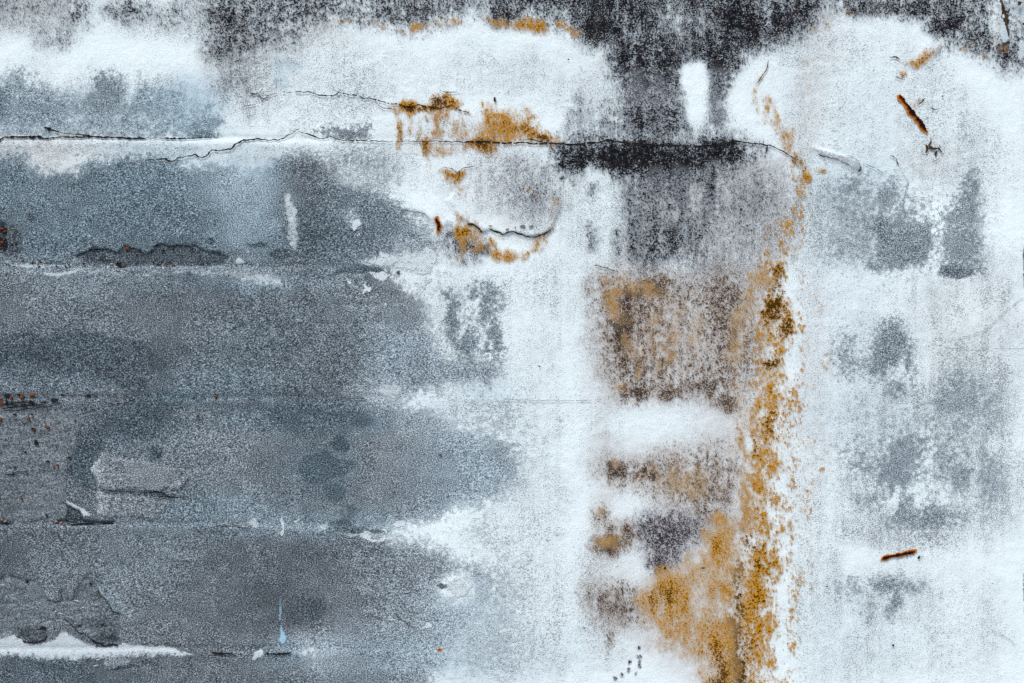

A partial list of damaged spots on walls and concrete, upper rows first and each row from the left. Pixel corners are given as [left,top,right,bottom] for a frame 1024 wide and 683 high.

crack [243,86,469,113]
crack [0,127,794,162]
corrosion [388,91,571,197]
corrosion [900,44,942,78]
corrosion [453,198,560,263]
leakage [0,0,1024,415]
peeling [0,65,554,683]
corrosion [600,276,709,378]
corrosion [630,71,832,683]